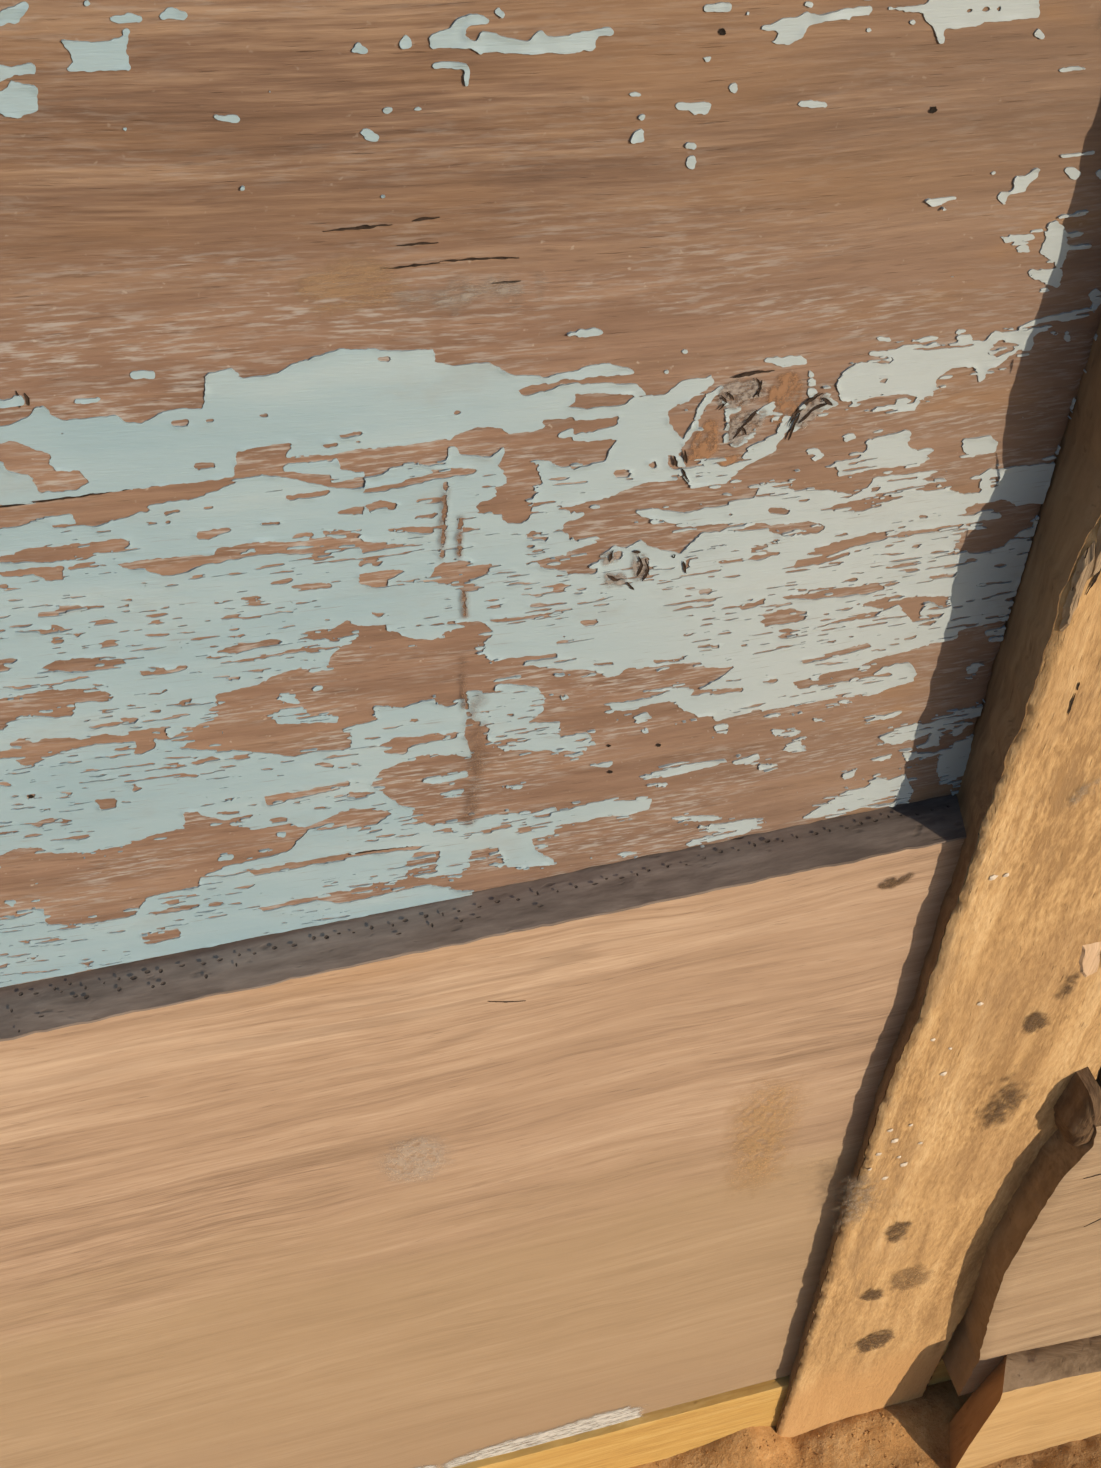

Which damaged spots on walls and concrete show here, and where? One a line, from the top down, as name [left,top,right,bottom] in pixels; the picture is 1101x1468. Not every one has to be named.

peeling [0,1,29,26]
peeling [61,7,188,72]
peeling [399,8,614,86]
peeling [703,0,1045,45]
peeling [0,63,38,118]
peeling [675,102,712,115]
peeling [997,168,1040,205]
peeling [1060,151,1101,180]
peeling [1001,210,1092,293]
crack [719,370,833,440]
crack [673,450,690,482]
peeling [0,289,1101,987]